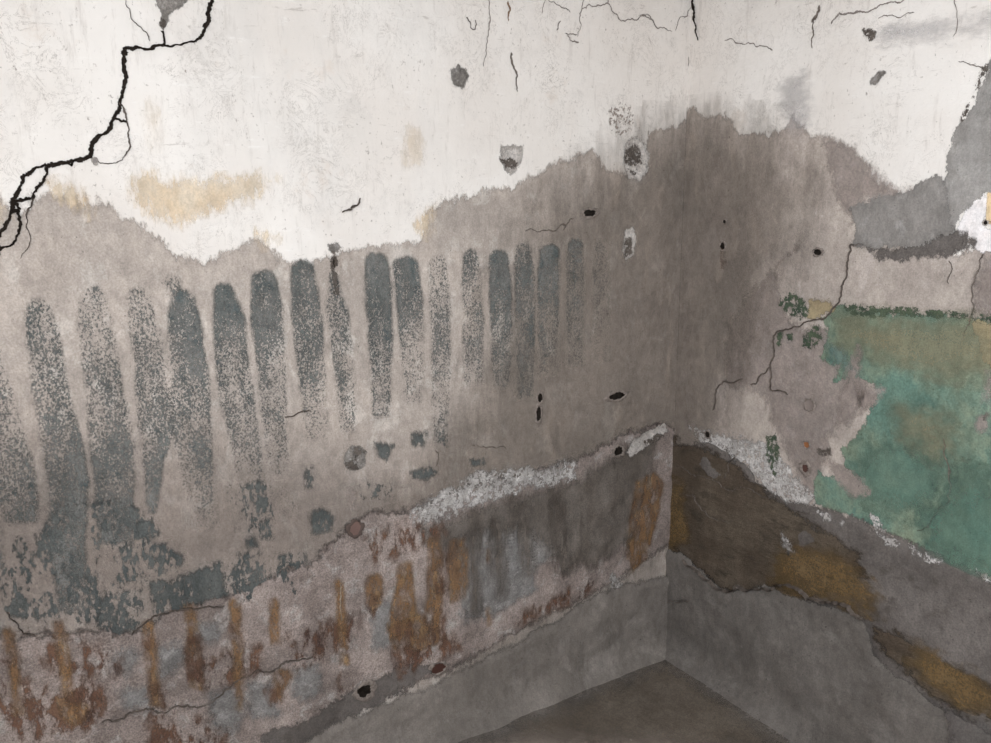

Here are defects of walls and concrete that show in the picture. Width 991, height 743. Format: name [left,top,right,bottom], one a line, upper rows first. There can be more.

crack [542,0,698,65]
crack [811,0,914,48]
crack [0,0,214,257]
peeling [957,194,991,253]
leakage [0,106,991,643]
flaking render [0,239,679,743]
peeling [692,271,991,735]
corrosion [0,621,122,741]
corrosion [185,599,279,709]
corrosion [364,522,468,678]
leakage [261,545,670,743]
leakage [508,661,784,743]